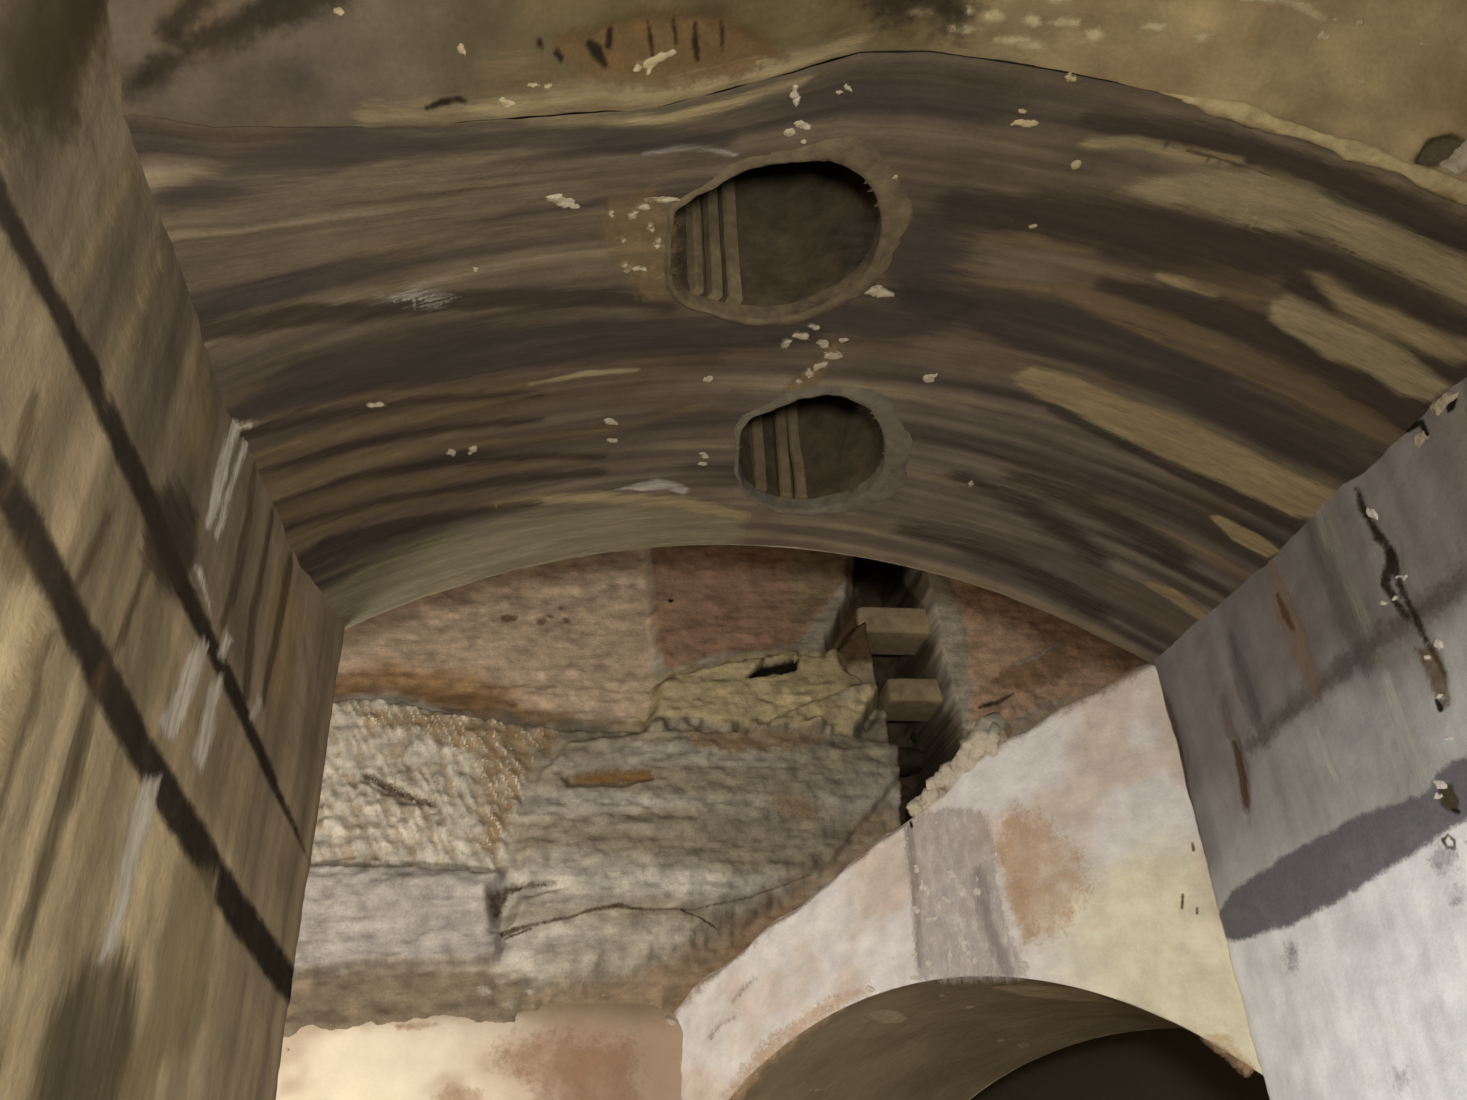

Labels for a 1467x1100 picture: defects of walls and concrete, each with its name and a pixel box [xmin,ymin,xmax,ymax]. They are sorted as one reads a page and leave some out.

water stain [864,0,1002,33]
water stain [995,0,1102,49]
spalling [1415,134,1467,176]
peeling [545,194,580,209]
peeling [864,285,895,298]
water stain [163,117,1467,540]
peeling [781,323,849,393]
water stain [1013,365,1381,718]
crack [1355,488,1447,712]
spalling [906,644,1077,817]
water stain [1162,692,1198,827]
crack [488,875,809,939]